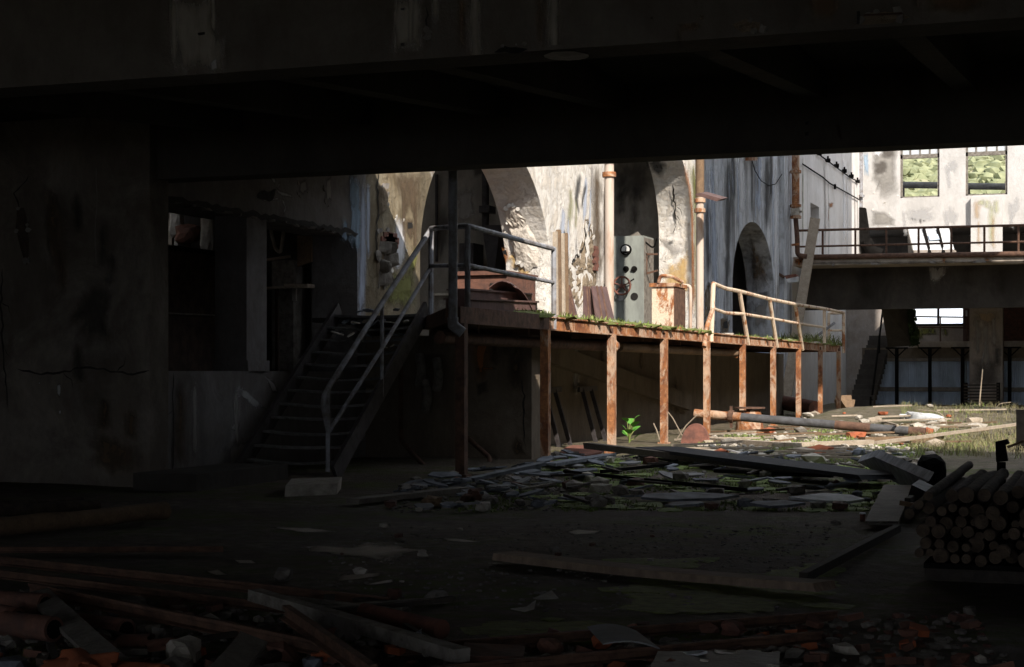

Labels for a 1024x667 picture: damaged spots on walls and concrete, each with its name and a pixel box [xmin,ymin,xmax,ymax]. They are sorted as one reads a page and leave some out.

flaking render [503,203,526,229]
crack [672,184,682,232]
flaking render [569,219,599,307]
water stain [693,156,778,326]
rust [560,445,604,456]